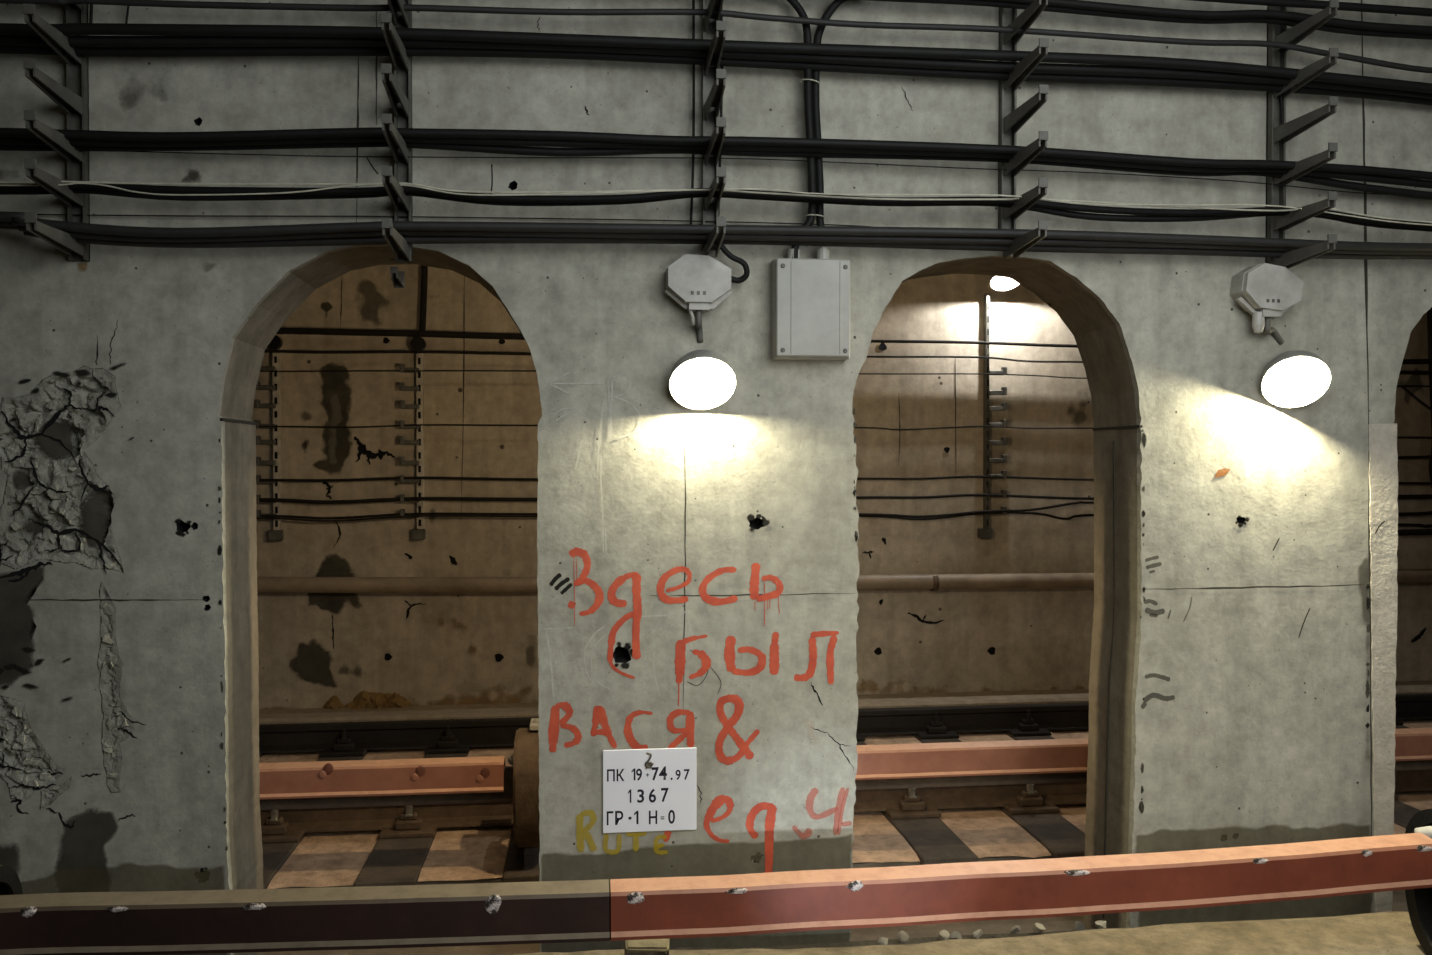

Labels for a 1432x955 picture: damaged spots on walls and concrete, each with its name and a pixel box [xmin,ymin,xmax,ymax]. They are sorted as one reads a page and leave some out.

water stain [359,281,387,323]
water stain [302,364,352,473]
crack [322,436,395,548]
spalling [0,363,134,810]
water stain [308,554,361,614]
water stain [289,640,360,687]